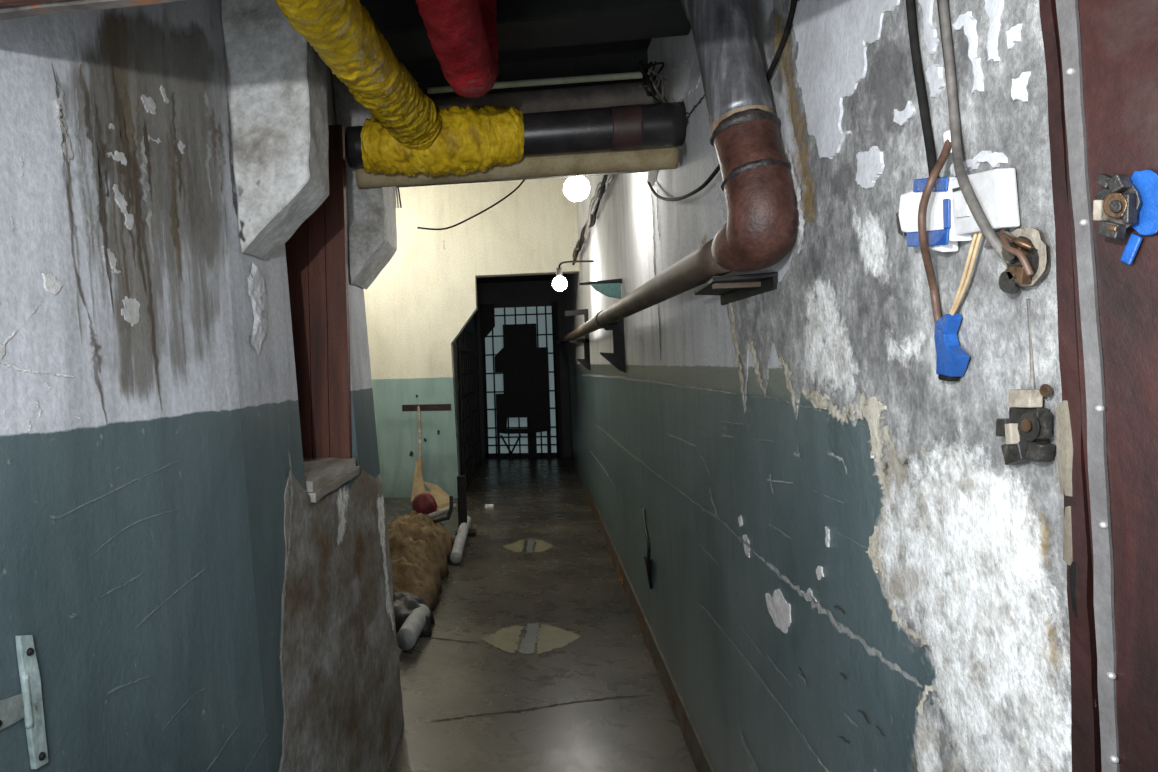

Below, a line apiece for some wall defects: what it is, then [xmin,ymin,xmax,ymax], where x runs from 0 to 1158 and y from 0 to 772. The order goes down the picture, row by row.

peeling [141,85,169,115]
peeling [107,151,127,165]
peeling [110,184,134,230]
damp [51,10,229,423]
peeling [101,245,121,274]
peeling [119,296,140,327]
flaking render [727,0,1071,772]